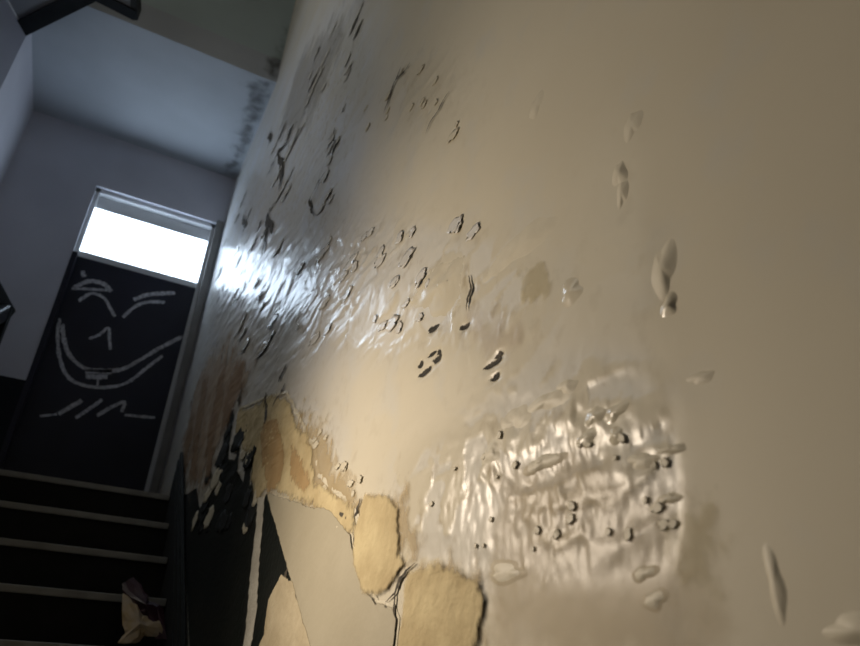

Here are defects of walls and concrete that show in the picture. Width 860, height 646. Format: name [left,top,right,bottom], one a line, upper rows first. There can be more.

peeling [191,390,482,646]